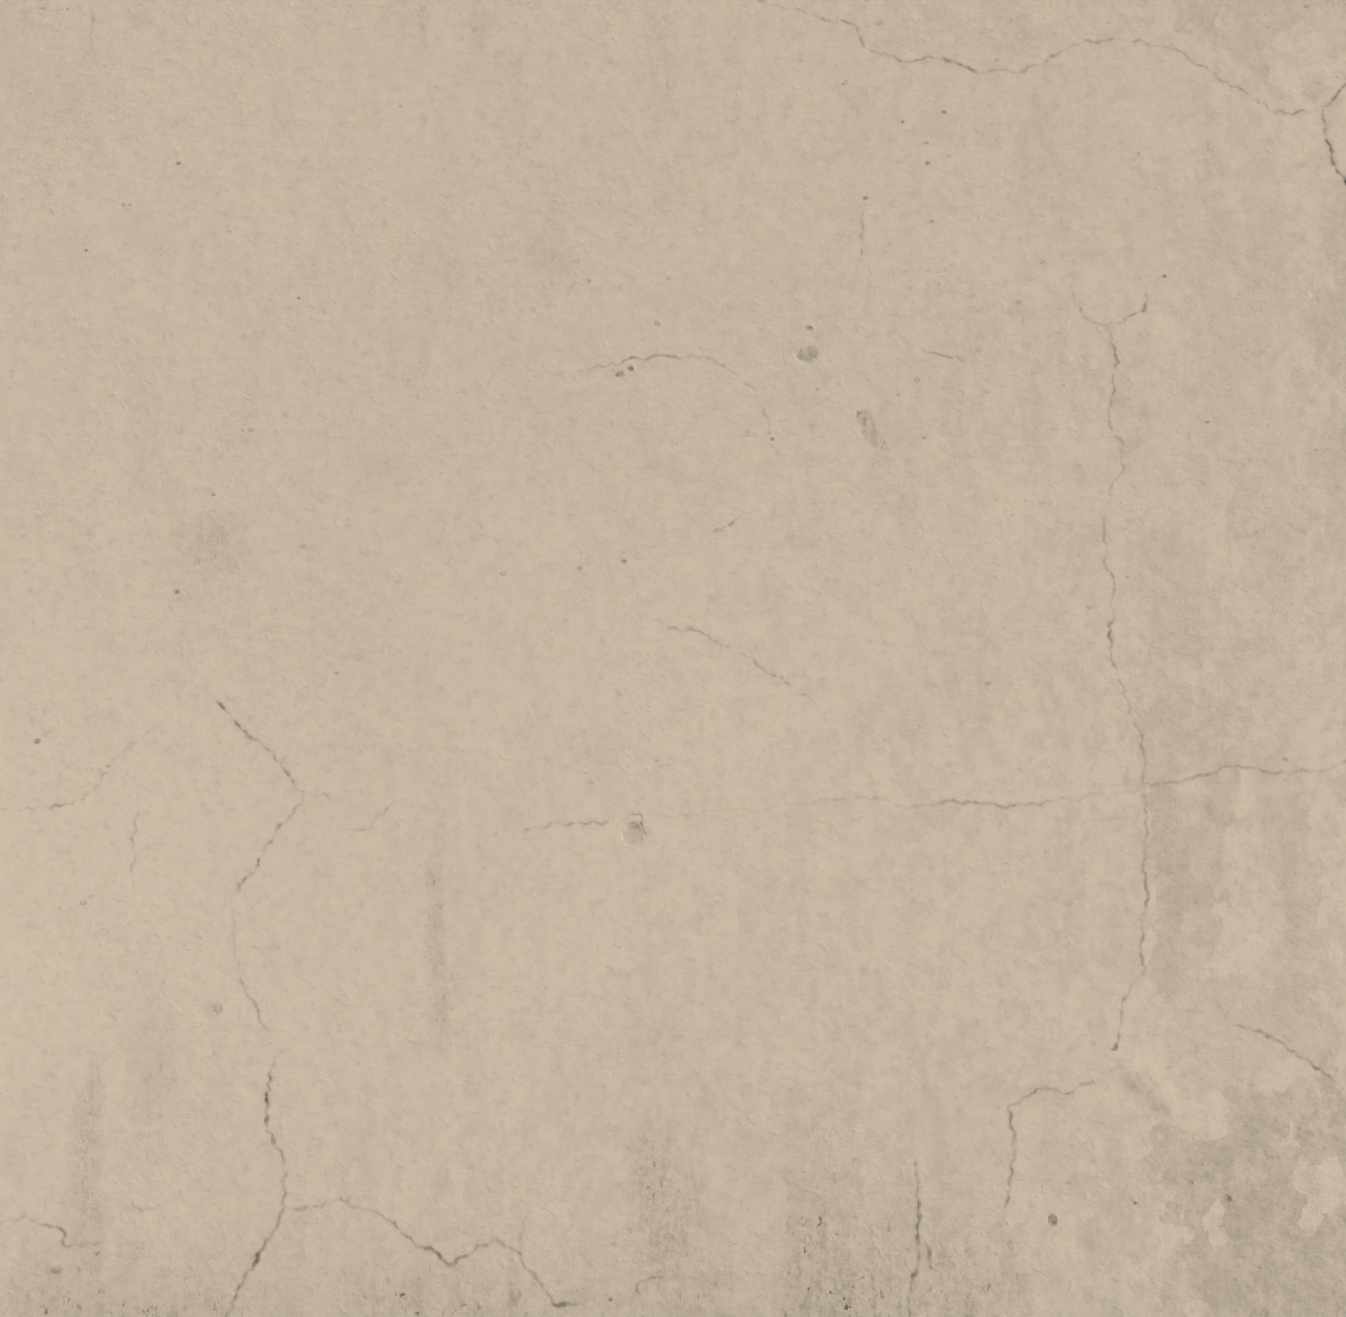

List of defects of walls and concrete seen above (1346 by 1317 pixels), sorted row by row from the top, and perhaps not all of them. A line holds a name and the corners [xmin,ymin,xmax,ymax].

crack [751,0,1346,194]
crack [509,813,634,839]
crack [995,269,1156,1226]
crack [200,687,604,1317]
crack [1213,999,1346,1104]
crack [0,1209,116,1254]